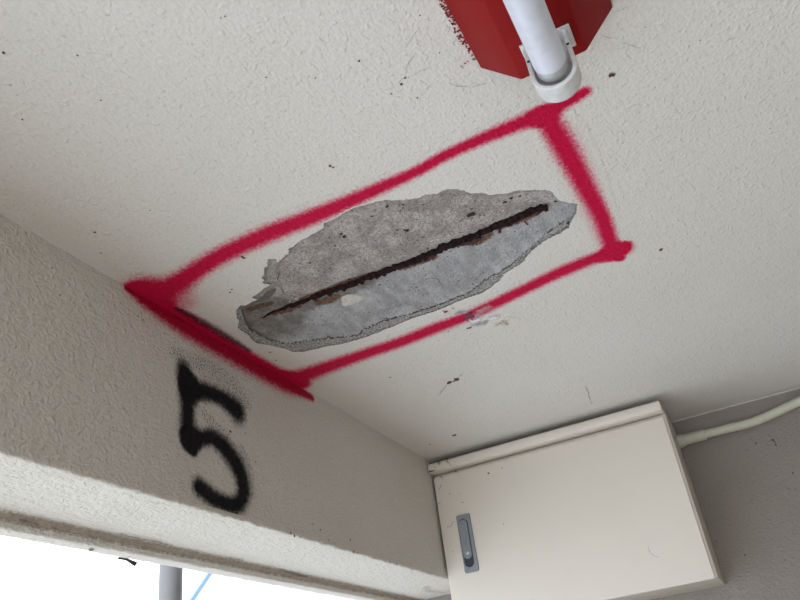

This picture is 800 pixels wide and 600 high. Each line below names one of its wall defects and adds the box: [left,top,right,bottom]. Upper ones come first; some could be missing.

corrosion [458,211,543,248]
corrosion [246,274,367,316]
spalling [236,189,578,361]